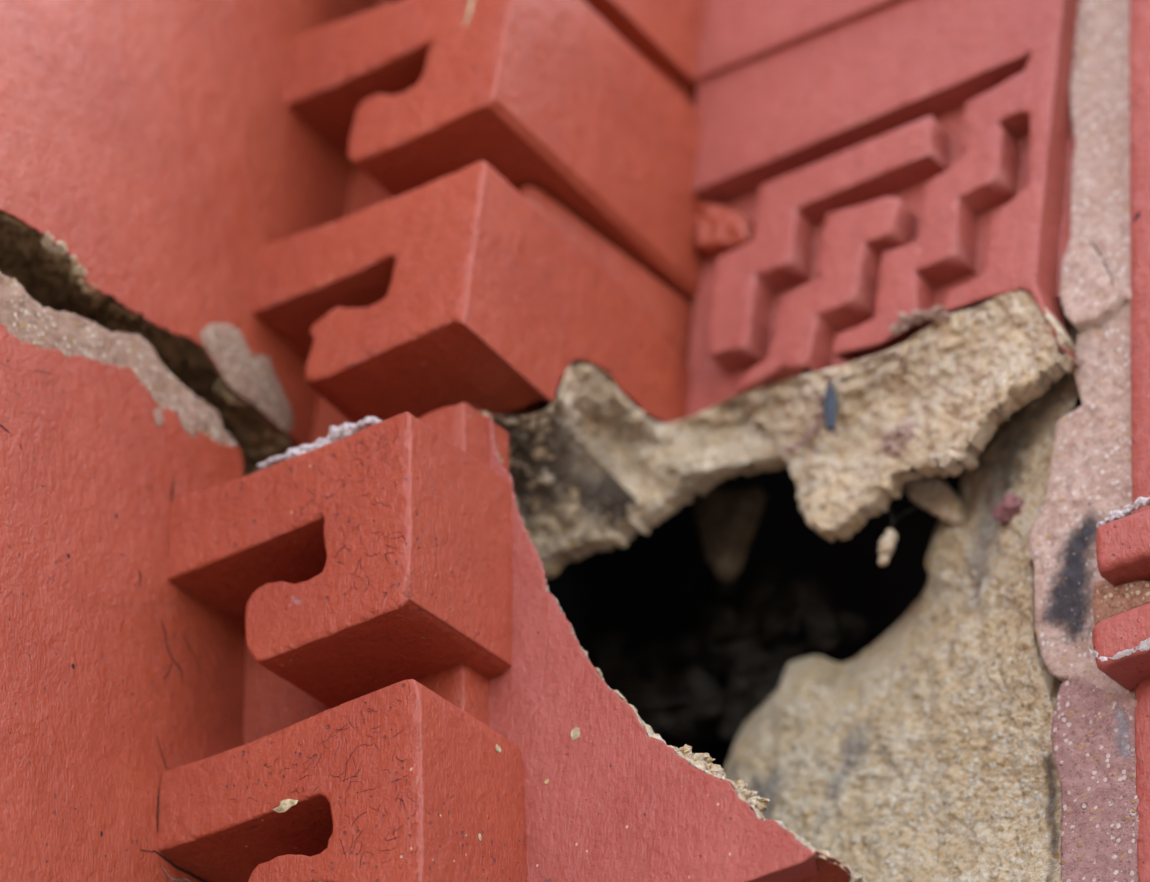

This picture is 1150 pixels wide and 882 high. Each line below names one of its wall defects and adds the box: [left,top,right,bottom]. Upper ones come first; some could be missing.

spalling [545,577,833,858]